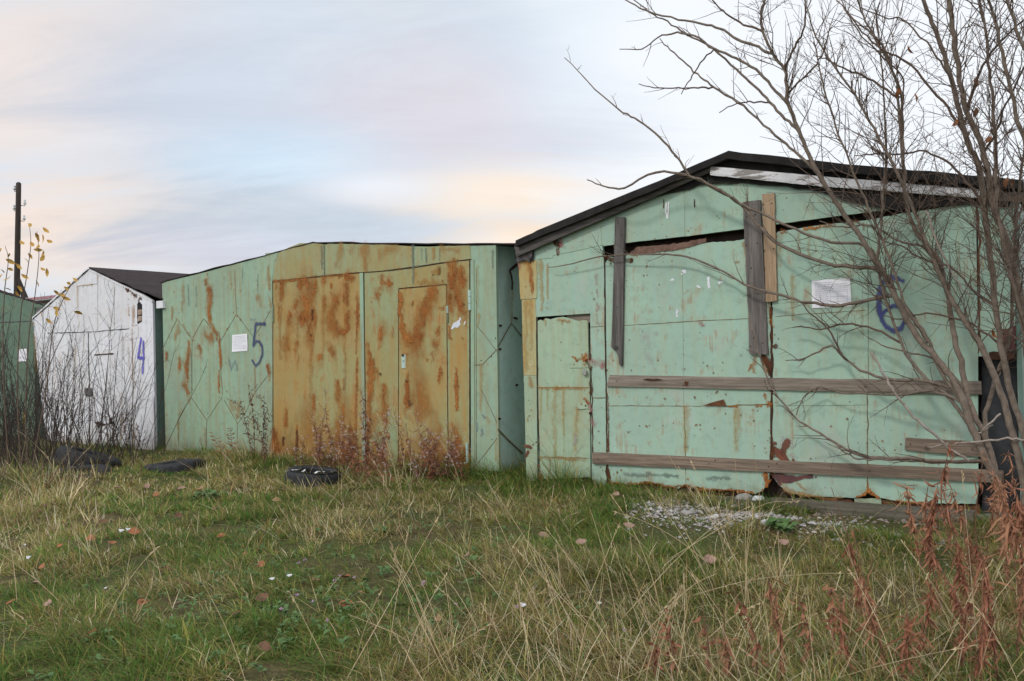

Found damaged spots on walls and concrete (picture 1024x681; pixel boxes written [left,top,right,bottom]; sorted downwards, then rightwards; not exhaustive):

corrosion [165,279,227,394]
corrosion [257,271,389,467]
corrosion [376,248,470,472]
corrosion [754,430,795,461]